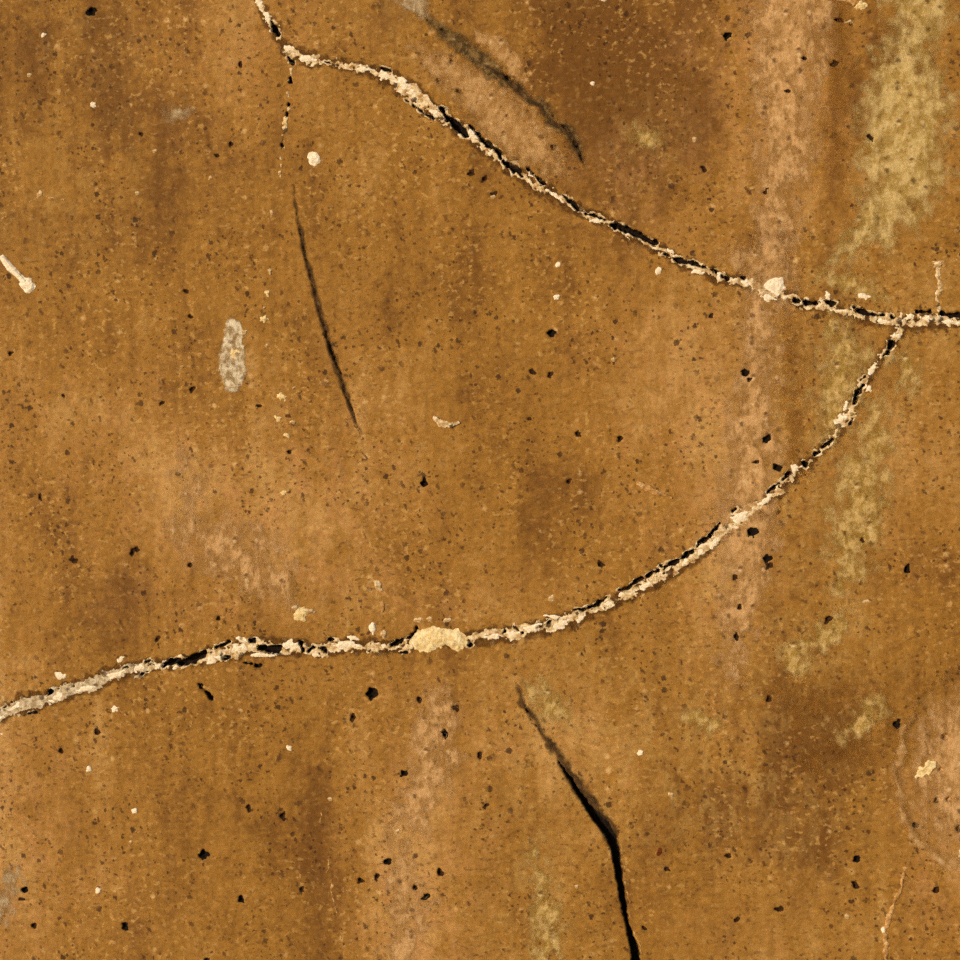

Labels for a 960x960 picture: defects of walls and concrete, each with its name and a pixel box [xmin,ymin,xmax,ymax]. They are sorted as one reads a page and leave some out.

water stain [816,0,956,301]
crack [0,0,960,735]
water stain [816,309,895,597]
water stain [885,352,920,399]
crack [517,687,642,960]
crack [881,867,907,960]